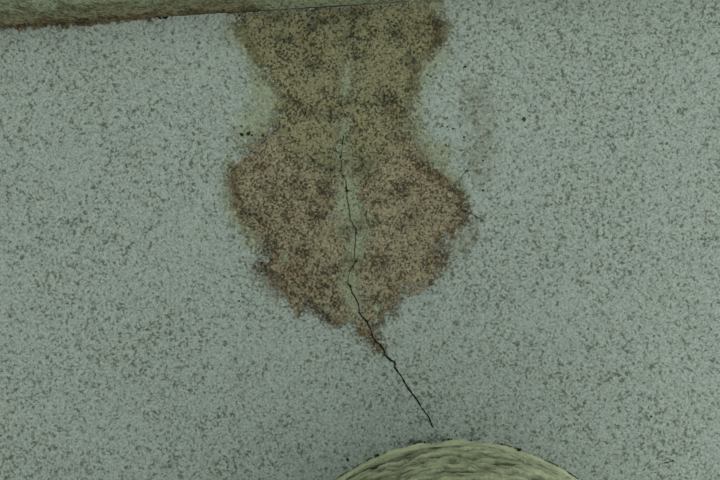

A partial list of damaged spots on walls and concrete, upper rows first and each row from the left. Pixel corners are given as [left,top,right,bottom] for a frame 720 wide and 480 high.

damp [0,0,483,355]
crack [339,82,433,445]